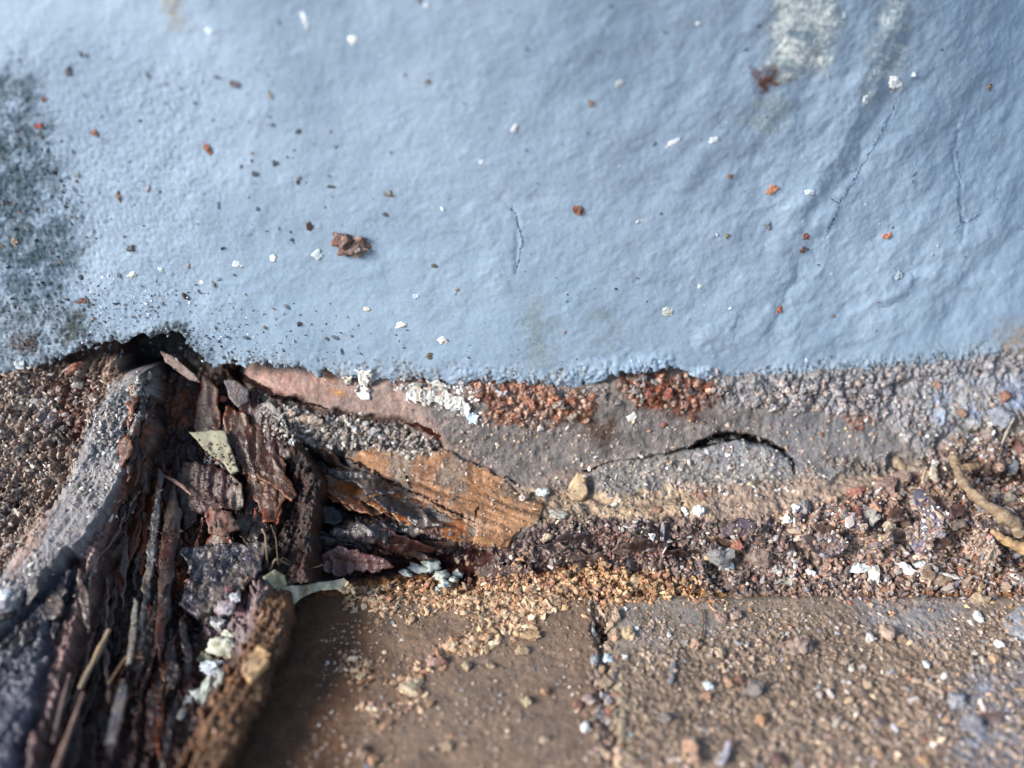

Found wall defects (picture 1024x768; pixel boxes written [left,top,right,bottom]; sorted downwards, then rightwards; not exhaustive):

crack [824,102,896,239]
peeling [342,370,373,400]
spalling [261,395,324,426]
spalling [362,421,381,436]
peeling [189,430,239,475]
crack [662,432,795,475]